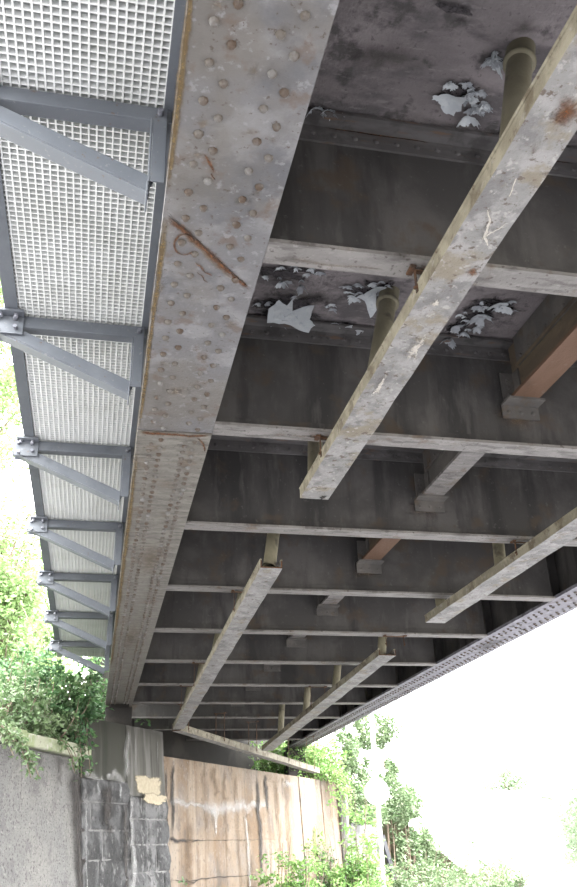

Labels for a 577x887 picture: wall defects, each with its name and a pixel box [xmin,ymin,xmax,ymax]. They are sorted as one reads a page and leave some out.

corrosion [166,0,193,179]
peeling [432,79,493,129]
peeling [480,51,503,79]
corrosion [556,100,577,125]
peeling [253,266,363,335]
peeling [341,280,394,318]
peeling [440,296,518,349]
corrosion [111,232,166,664]
spalling [135,775,167,805]